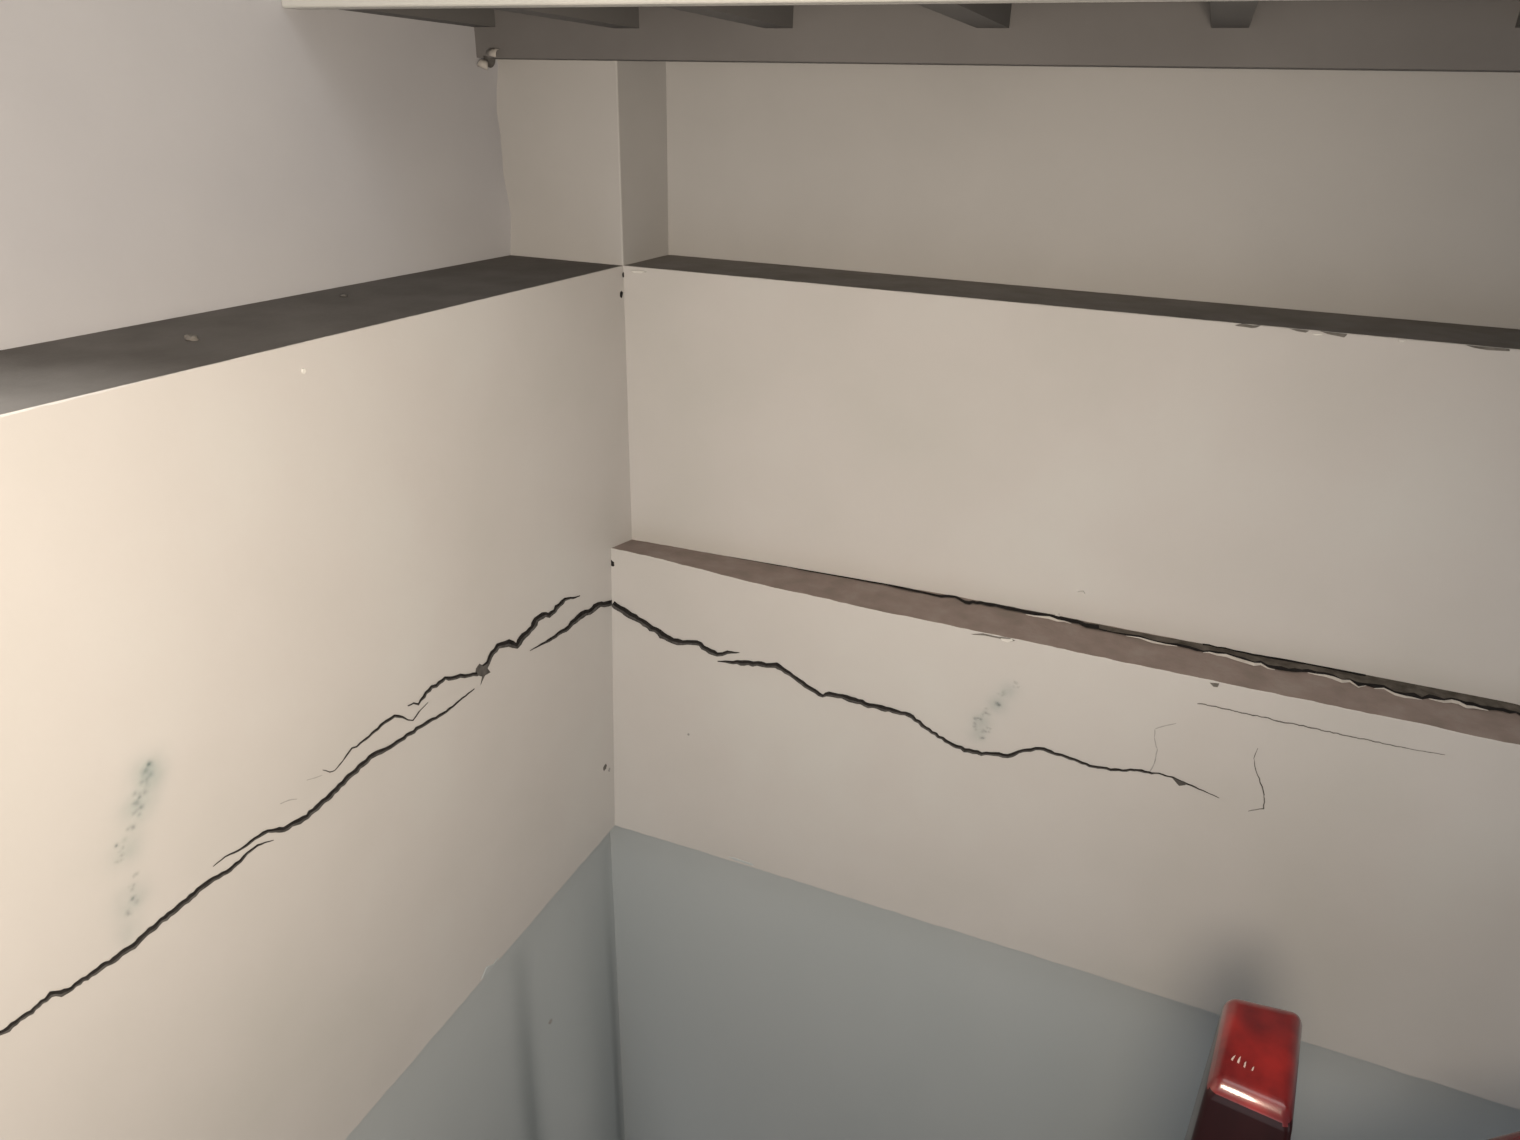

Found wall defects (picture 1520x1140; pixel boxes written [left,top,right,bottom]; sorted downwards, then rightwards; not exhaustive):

crack [0,595,1444,1035]
crack [705,552,1520,715]